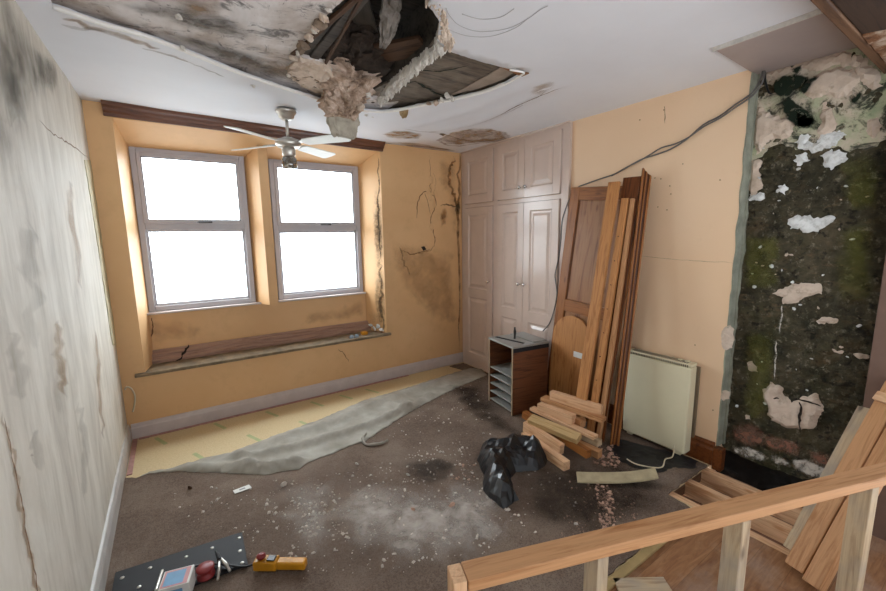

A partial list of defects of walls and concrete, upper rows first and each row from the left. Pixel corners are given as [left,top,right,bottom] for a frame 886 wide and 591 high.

water stain [180,4,236,34]
water stain [185,39,299,81]
spalling [286,57,334,94]
spalling [377,0,455,108]
crack [404,161,436,255]
efflorescence [748,192,765,201]
water stain [787,215,836,233]
water stain [376,267,385,331]
efflorescence [735,447,764,460]
spalling [734,426,798,453]
efflorescence [775,458,824,476]
crack [5,422,38,591]